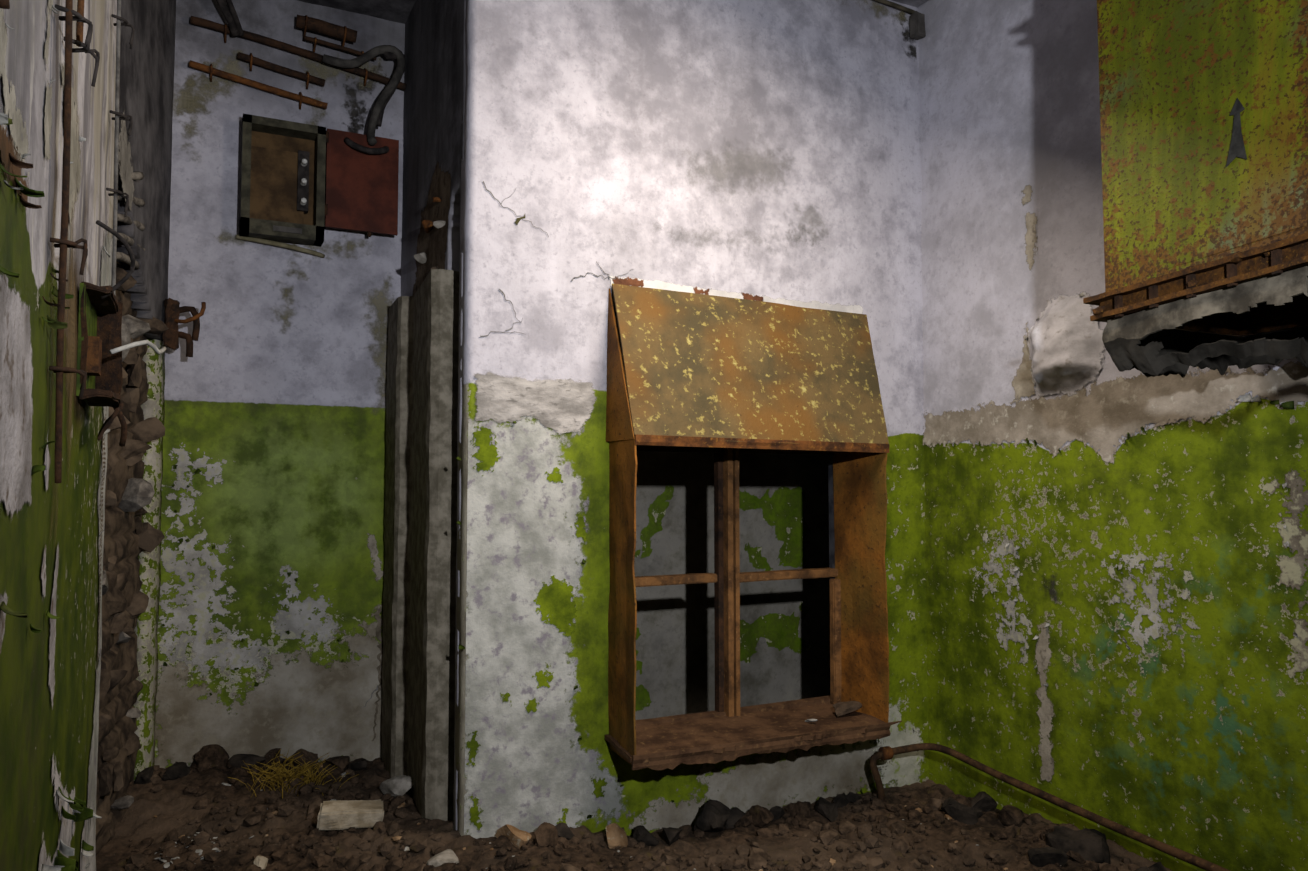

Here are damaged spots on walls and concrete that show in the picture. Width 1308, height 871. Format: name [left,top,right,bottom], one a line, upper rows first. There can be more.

peeling [0,0,86,224]
spalling [101,106,145,291]
peeling [0,266,74,518]
leakage [51,256,86,448]
spalling [923,322,1308,464]
peeling [0,543,60,710]
peeling [38,314,384,871]
peeling [456,415,925,839]
peeling [971,526,1057,782]
peeling [1098,547,1201,673]
peeling [1257,460,1308,683]